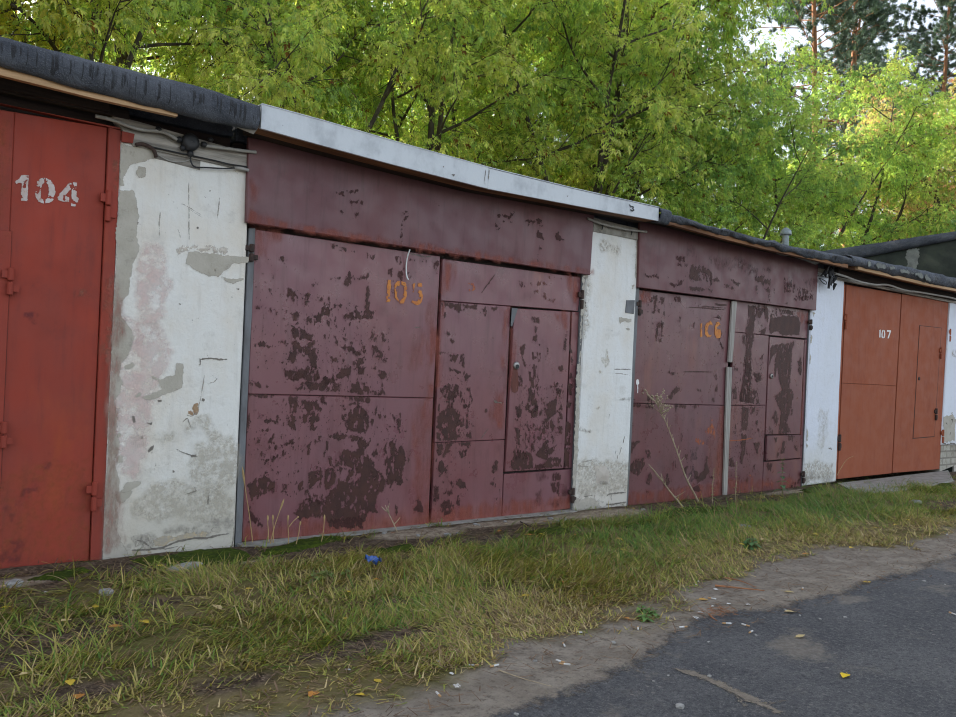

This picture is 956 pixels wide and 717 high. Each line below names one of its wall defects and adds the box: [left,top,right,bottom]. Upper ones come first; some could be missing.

flaking render [102,412,141,560]
flaking render [109,143,154,400]
flaking render [136,363,184,402]
flaking render [186,251,249,290]
rust [247,256,409,529]
rust [388,256,440,294]
rust [414,332,473,516]
rust [442,301,497,318]
rust [511,317,573,496]
rust [629,422,655,493]
rust [645,256,740,353]
rust [661,275,814,492]